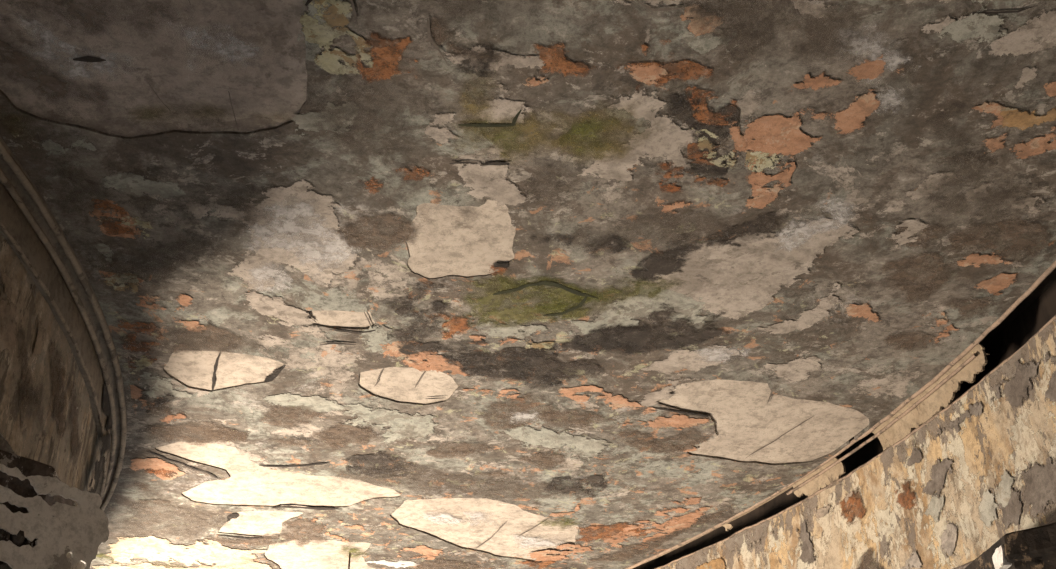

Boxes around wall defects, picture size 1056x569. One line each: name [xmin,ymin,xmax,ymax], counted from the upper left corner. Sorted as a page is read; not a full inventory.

flaking render [406,45,545,279]
leakage [426,0,644,159]
leakage [690,0,906,70]
leakage [880,91,902,109]
peeling [99,171,458,443]
flaking render [146,442,579,569]
peeling [504,426,613,463]
leakage [385,281,747,430]
peeling [563,218,859,342]
flaking render [639,345,869,464]
peeling [757,283,882,335]
spalling [992,545,1012,569]